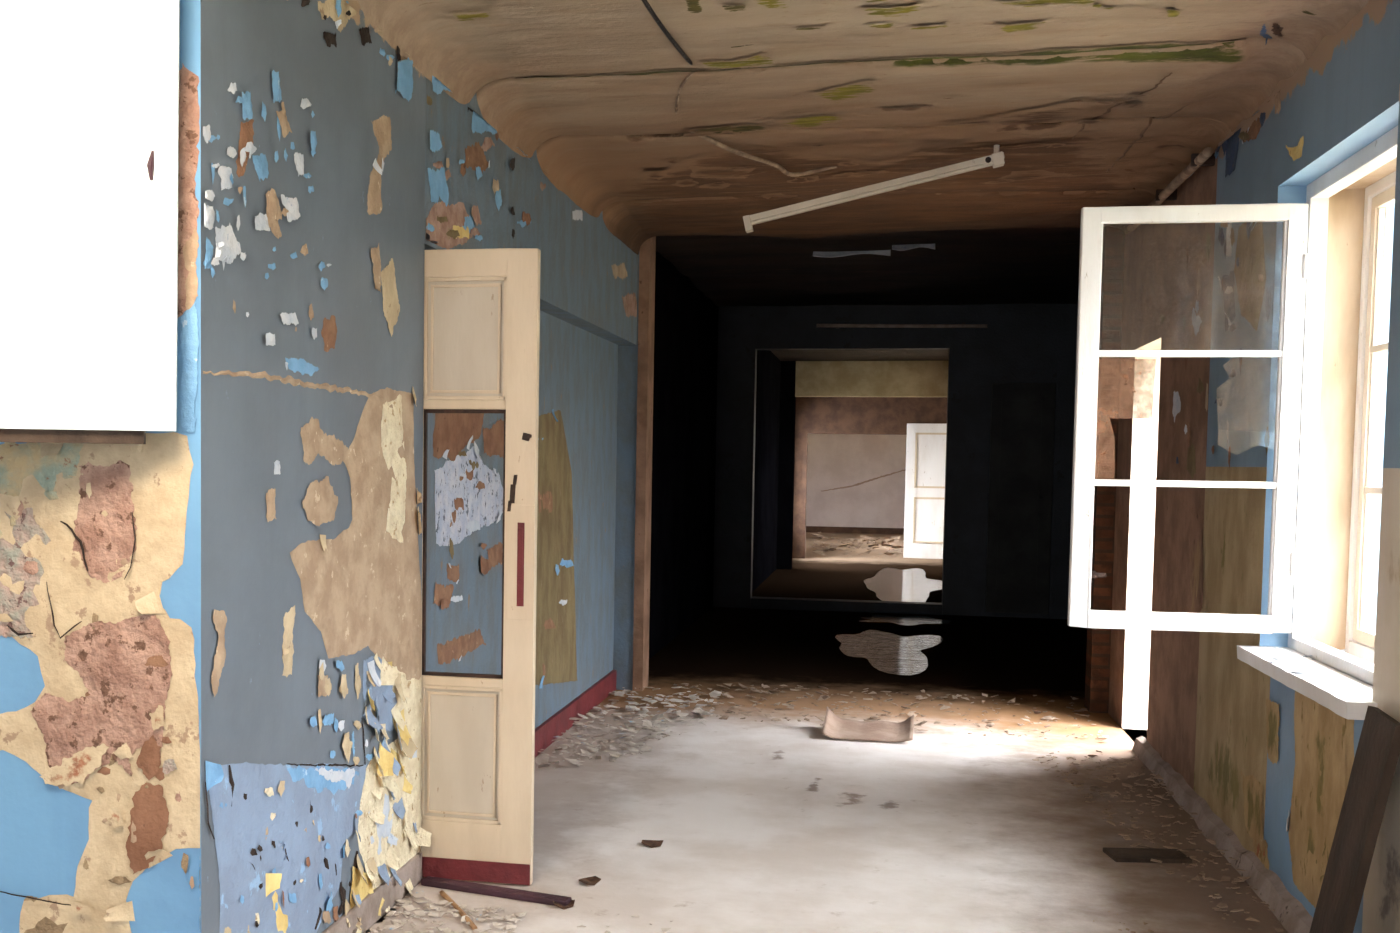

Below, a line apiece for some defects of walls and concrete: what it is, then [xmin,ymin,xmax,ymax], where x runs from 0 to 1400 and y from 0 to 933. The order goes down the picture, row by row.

peeling [287,0,451,106]
peeling [367,115,392,215]
peeling [426,107,531,249]
peeling [371,244,400,336]
peeling [611,263,637,318]
peeling [0,63,337,933]
peeling [535,409,578,689]
peeling [240,387,517,933]
water stain [1266,698,1280,764]
water stain [1241,770,1263,842]
water stain [1373,831,1400,933]